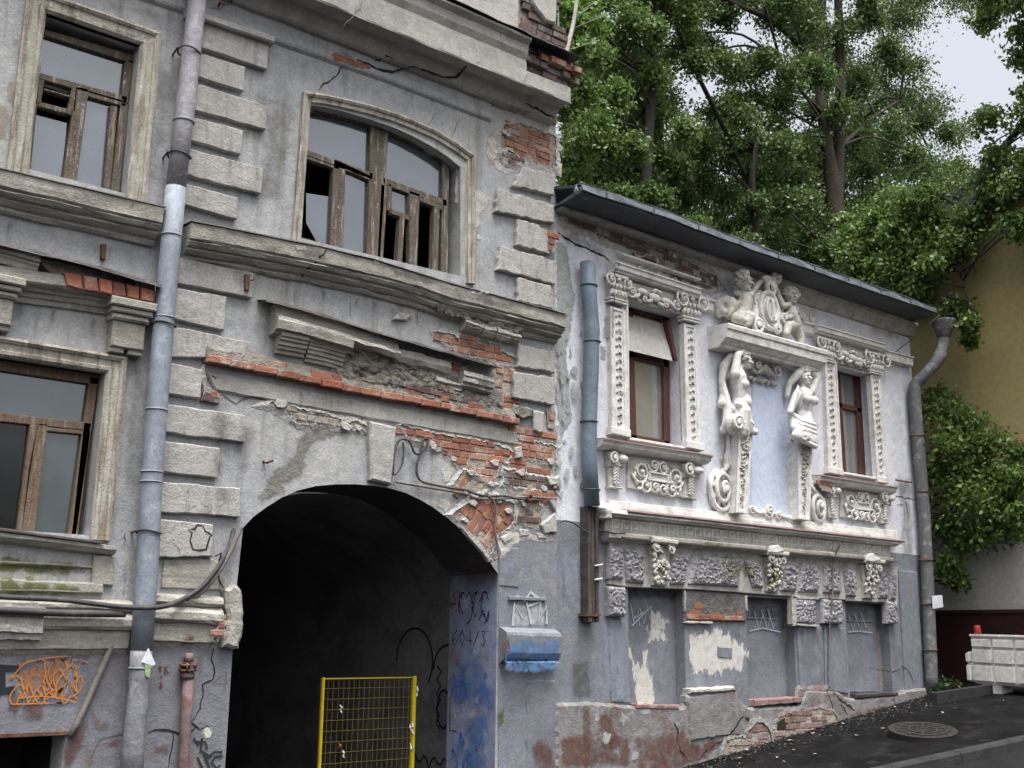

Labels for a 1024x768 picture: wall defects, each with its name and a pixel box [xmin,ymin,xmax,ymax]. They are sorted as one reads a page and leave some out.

crack [319,55,479,90]
flaking render [489,109,563,177]
flaking render [202,214,727,558]
flaking render [682,590,748,624]
crack [148,524,226,767]
crack [826,691,854,715]
crack [675,716,750,762]